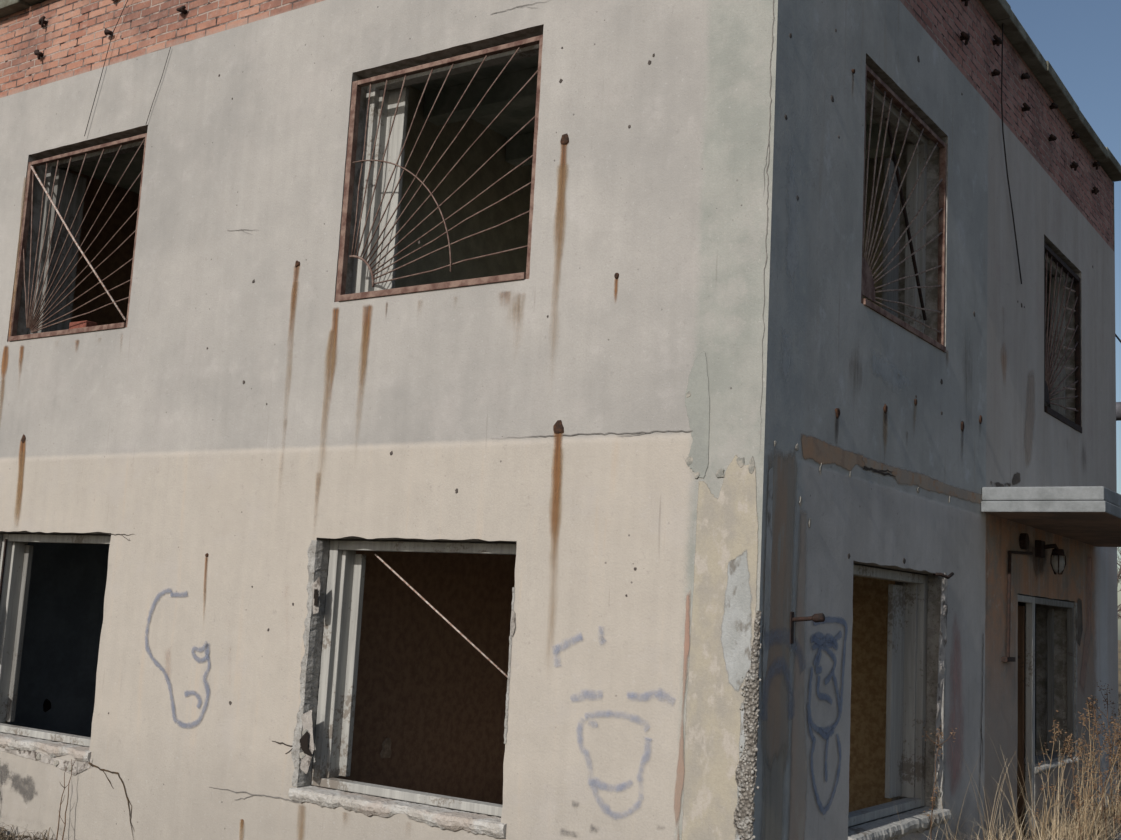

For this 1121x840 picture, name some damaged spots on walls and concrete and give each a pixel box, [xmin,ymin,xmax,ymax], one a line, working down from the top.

rust [557,133,569,268]
rust [326,308,338,399]
rust [361,305,371,382]
rust [16,434,26,514]
rust [552,420,564,543]
peeling [991,473,1021,487]
spalling [312,577,320,614]
peeling [674,352,983,840]
spalling [299,710,314,774]
water stain [0,765,35,800]